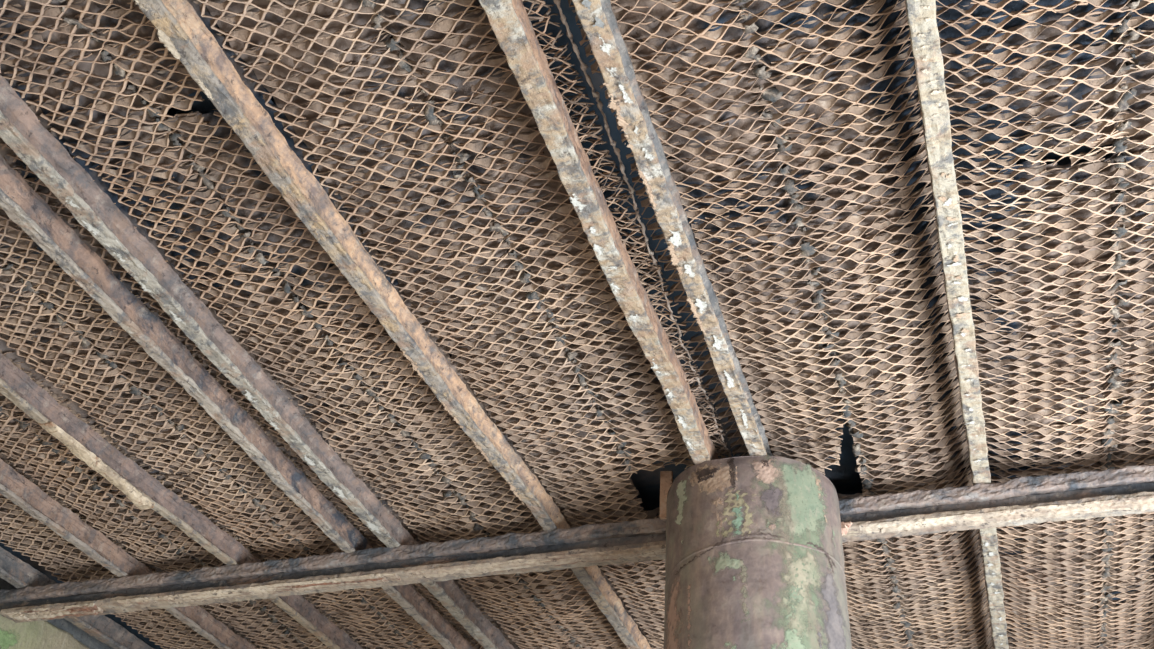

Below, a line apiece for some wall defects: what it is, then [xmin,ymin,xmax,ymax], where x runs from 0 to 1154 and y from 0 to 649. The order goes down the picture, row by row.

corrosion [690,464,732,526]
corrosion [753,459,783,529]
peeling [708,553,750,620]
peeling [716,461,835,649]